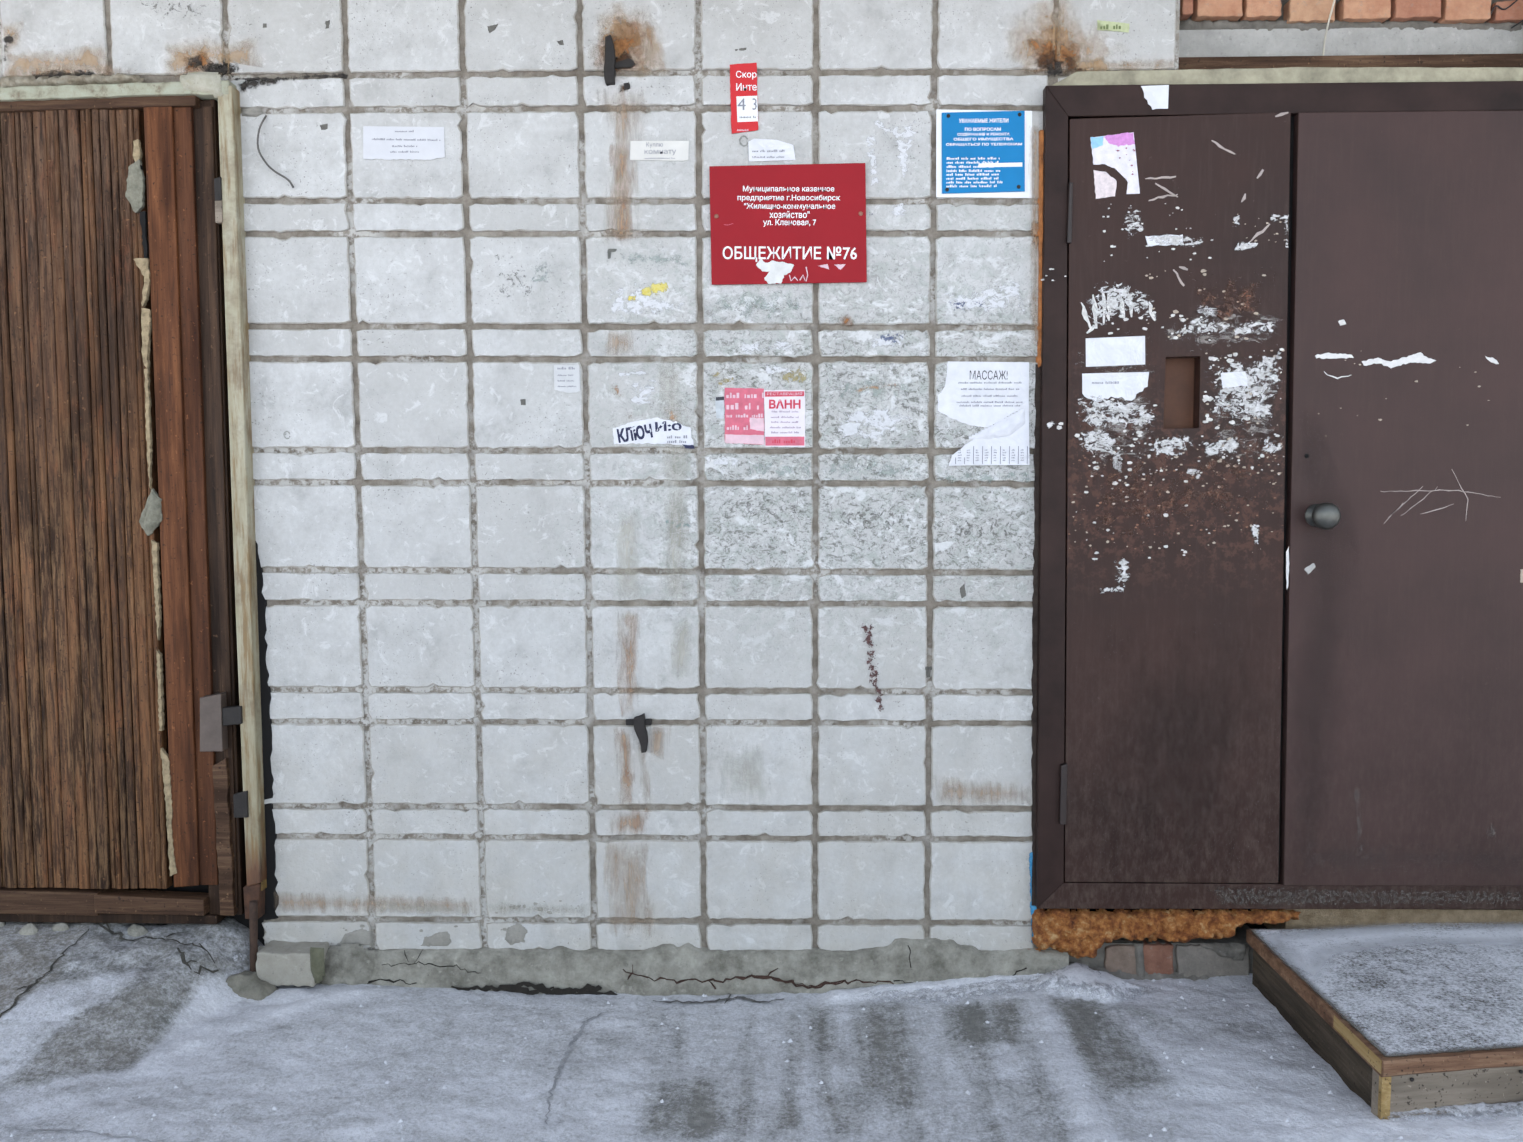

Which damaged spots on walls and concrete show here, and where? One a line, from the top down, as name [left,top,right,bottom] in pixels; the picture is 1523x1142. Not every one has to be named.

corrosion [4,29,108,79]
corrosion [172,45,348,91]
corrosion [601,17,659,133]
corrosion [1020,16,1131,76]
corrosion [623,636,635,693]
corrosion [622,734,632,788]
corrosion [620,813,641,831]
crack [367,945,914,1125]